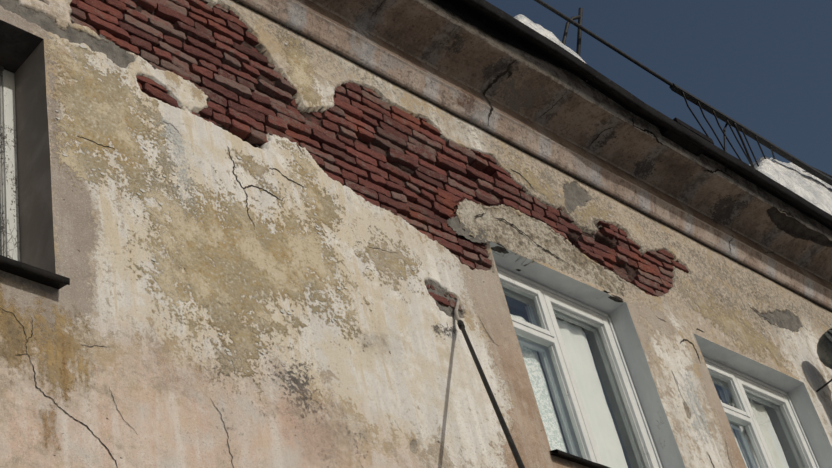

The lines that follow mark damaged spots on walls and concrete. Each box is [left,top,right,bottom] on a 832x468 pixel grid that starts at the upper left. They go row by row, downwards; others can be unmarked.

crack [483,60,516,126]
crack [228,147,307,226]
flaking render [0,0,689,393]
spalling [766,207,832,247]
peeling [675,278,803,372]
crack [1,308,118,468]
crack [210,398,234,467]